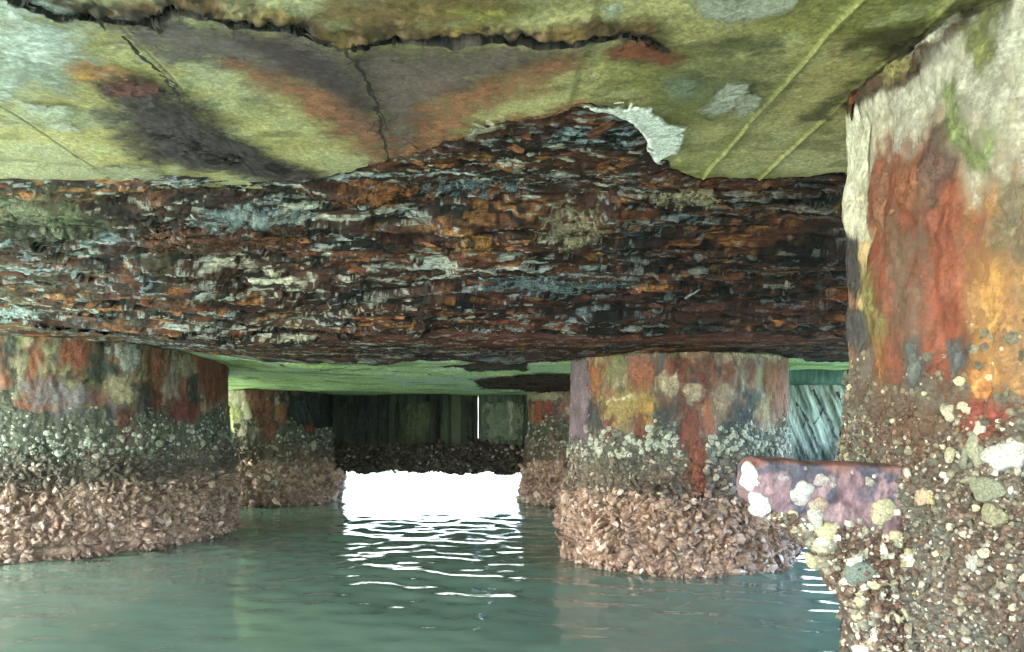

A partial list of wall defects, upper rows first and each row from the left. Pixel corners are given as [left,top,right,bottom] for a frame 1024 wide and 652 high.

rust [59,57,137,86]
crack [6,0,217,145]
crack [245,20,430,163]
crack [629,33,671,53]
leakage [95,163,164,181]
rust [331,178,438,208]
spalling [89,76,847,196]
rust [136,220,322,254]
rust [445,231,499,253]
rust [866,114,1024,454]
rust [145,347,227,424]
rust [587,357,664,443]